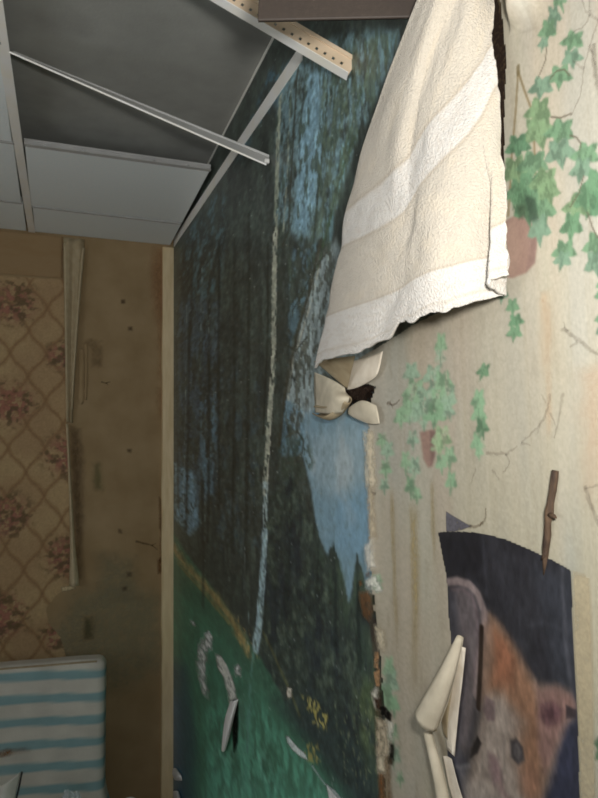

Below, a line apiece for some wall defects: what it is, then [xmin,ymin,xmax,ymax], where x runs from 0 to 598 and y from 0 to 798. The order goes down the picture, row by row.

peeling [375,627,385,649]
peeling [372,691,394,771]